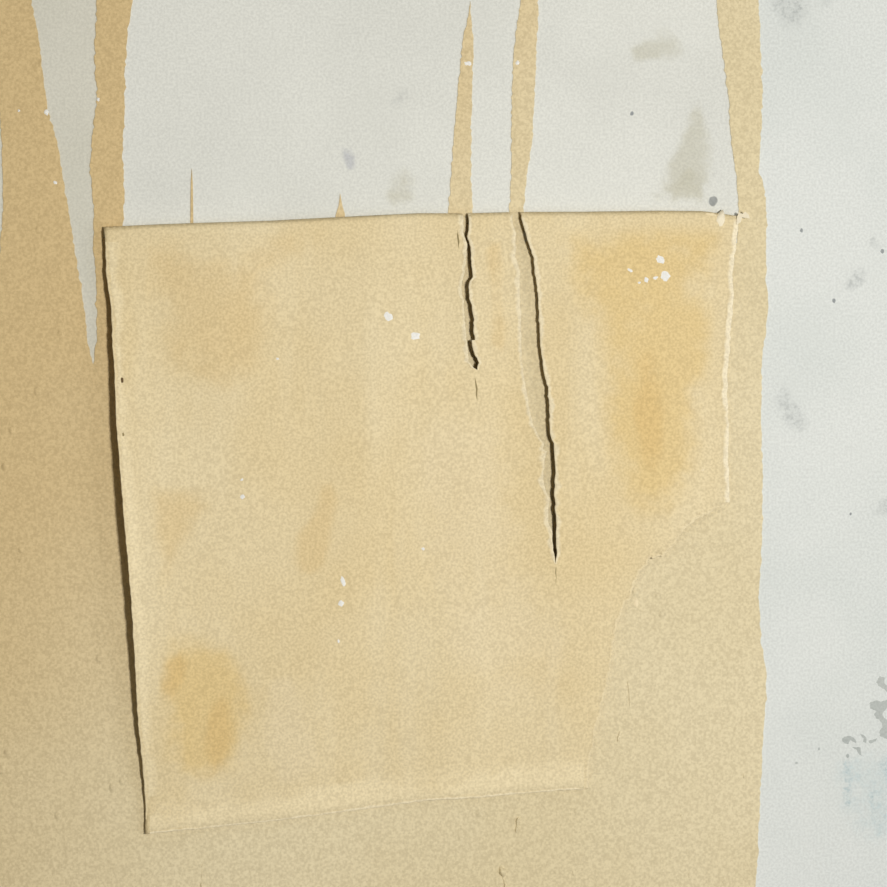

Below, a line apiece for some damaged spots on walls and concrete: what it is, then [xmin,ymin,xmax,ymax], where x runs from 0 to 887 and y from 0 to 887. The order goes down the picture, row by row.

peeling [31,0,750,834]